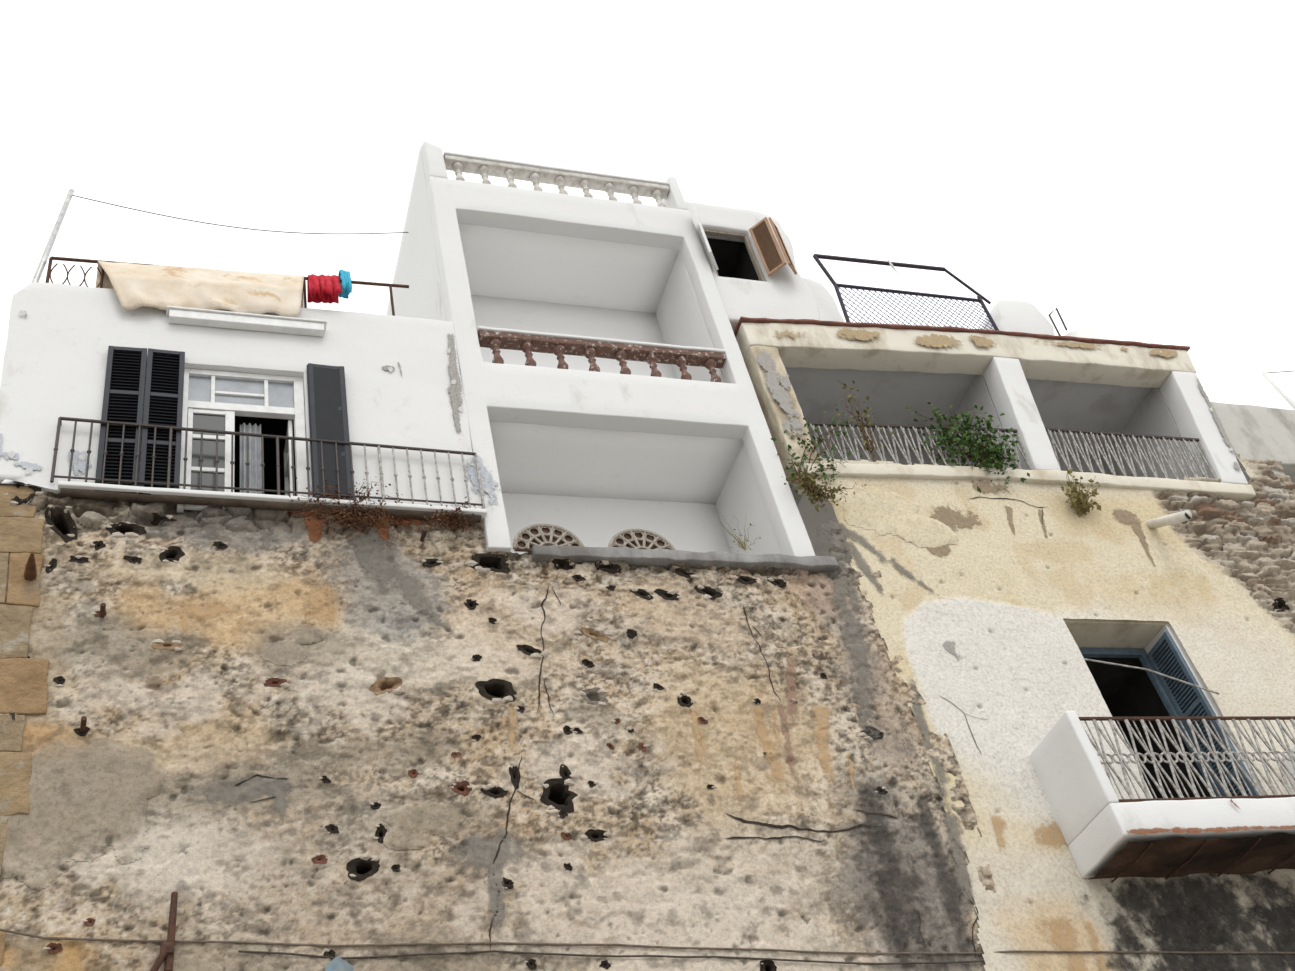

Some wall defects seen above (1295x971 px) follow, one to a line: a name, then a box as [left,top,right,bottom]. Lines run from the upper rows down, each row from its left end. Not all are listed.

crack [538,586,561,715]
spalling [1265,597,1290,612]
crack [489,755,535,950]